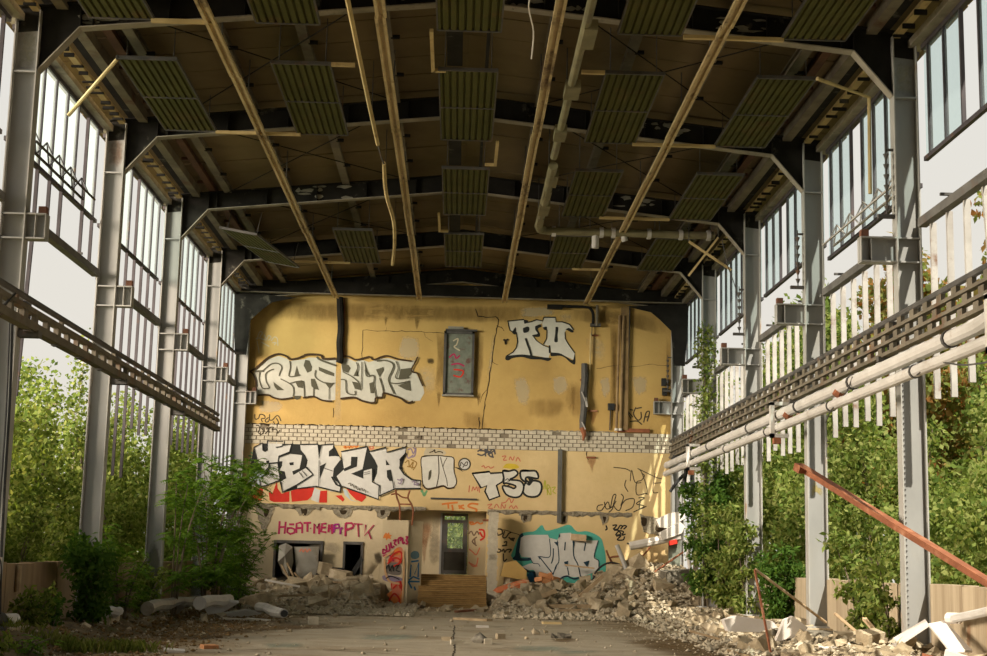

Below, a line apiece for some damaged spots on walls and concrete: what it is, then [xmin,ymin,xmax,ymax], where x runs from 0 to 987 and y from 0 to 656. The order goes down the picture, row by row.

crack [475,309,504,434]
crack [452,625,519,656]